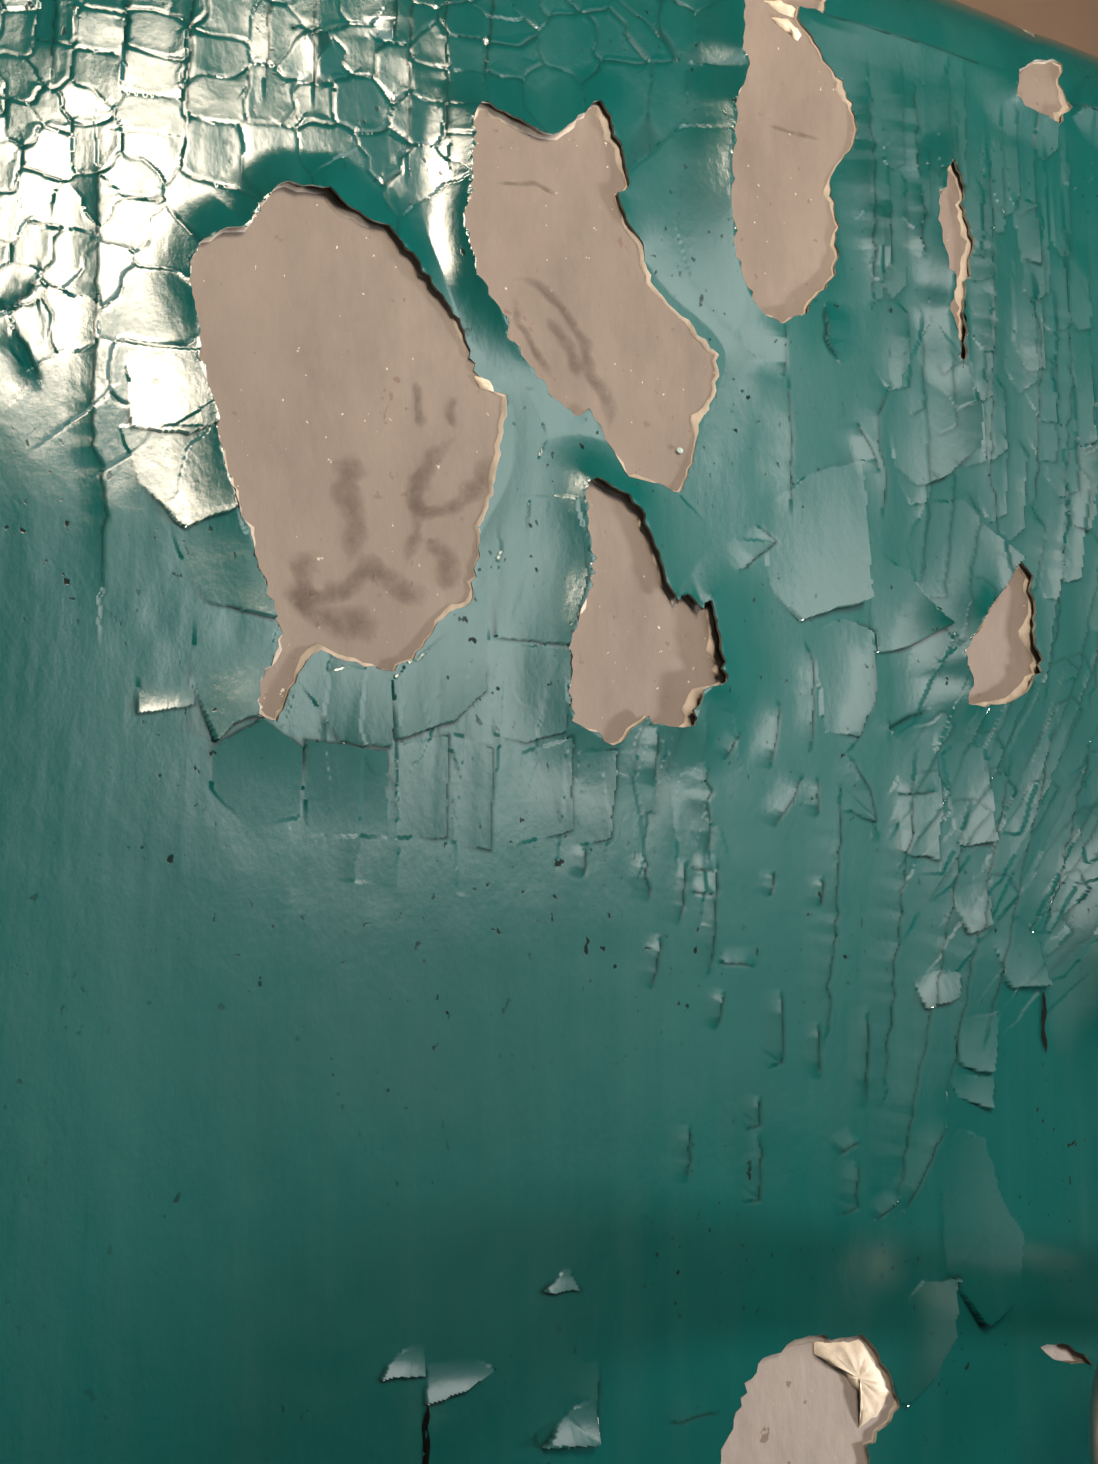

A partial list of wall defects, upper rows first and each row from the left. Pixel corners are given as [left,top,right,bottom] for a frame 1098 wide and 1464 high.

crack [0,0,722,662]
peeling [121,86,743,848]
crack [291,12,1098,1242]
peeling [713,0,874,338]
peeling [763,143,1058,735]
peeling [892,722,999,859]
peeling [948,1011,1000,1108]
peeling [951,879,1053,987]
peeling [1000,20,1092,139]
crack [413,1389,441,1464]
crack [533,1349,613,1457]
peeling [702,1128,1025,1464]